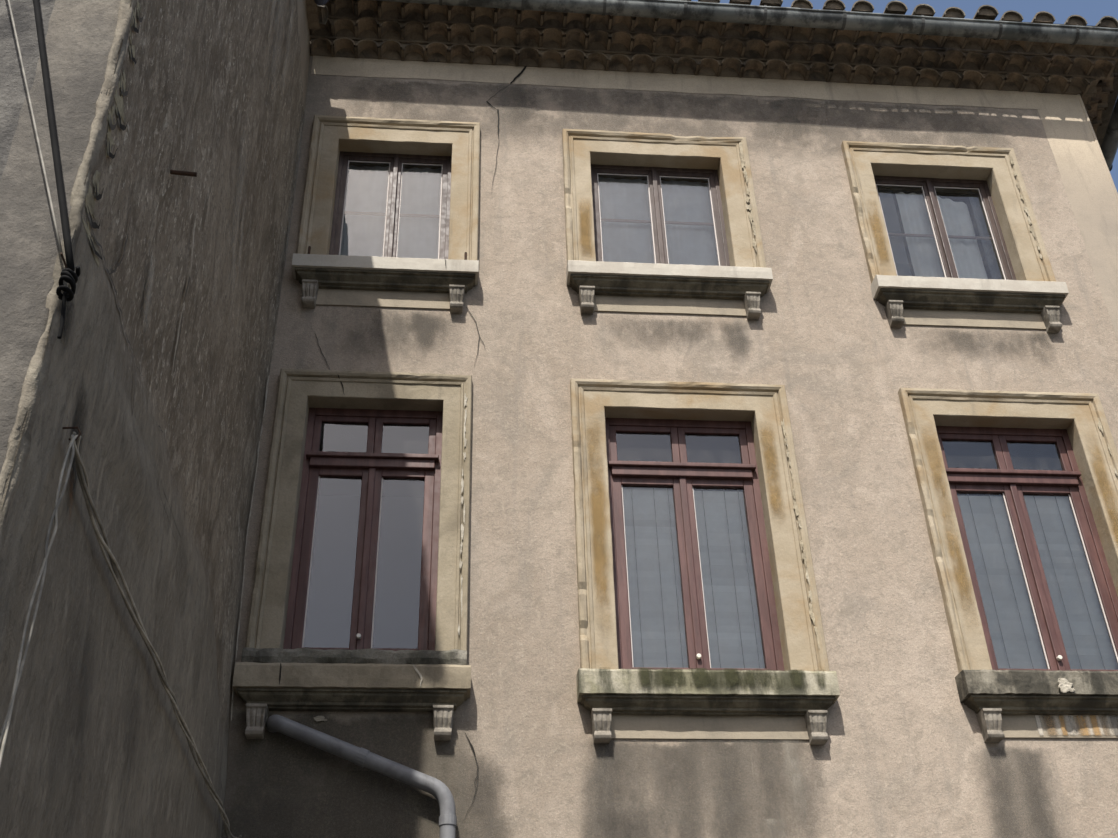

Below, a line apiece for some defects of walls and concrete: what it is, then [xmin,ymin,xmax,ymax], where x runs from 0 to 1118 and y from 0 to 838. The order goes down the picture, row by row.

crack [486,66,527,185]
water stain [639,668,672,685]
water stain [694,668,708,686]
water stain [791,670,803,686]
crack [464,733,479,820]